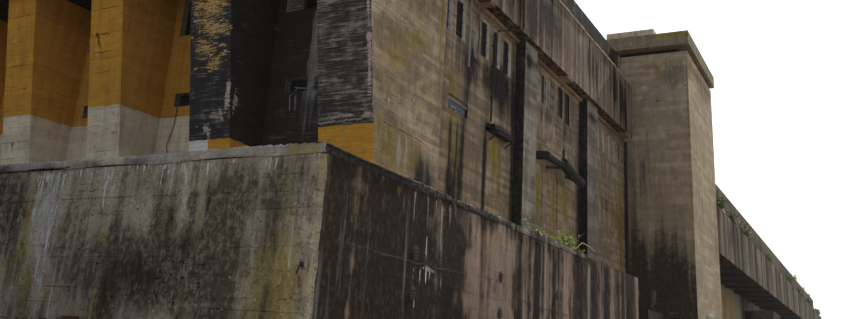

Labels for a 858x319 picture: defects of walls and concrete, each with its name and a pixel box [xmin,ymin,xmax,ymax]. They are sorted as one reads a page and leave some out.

peeling [189,0,232,73]
water stain [30,167,115,319]
water stain [128,162,210,267]
water stain [514,239,563,319]
water stain [577,259,614,319]